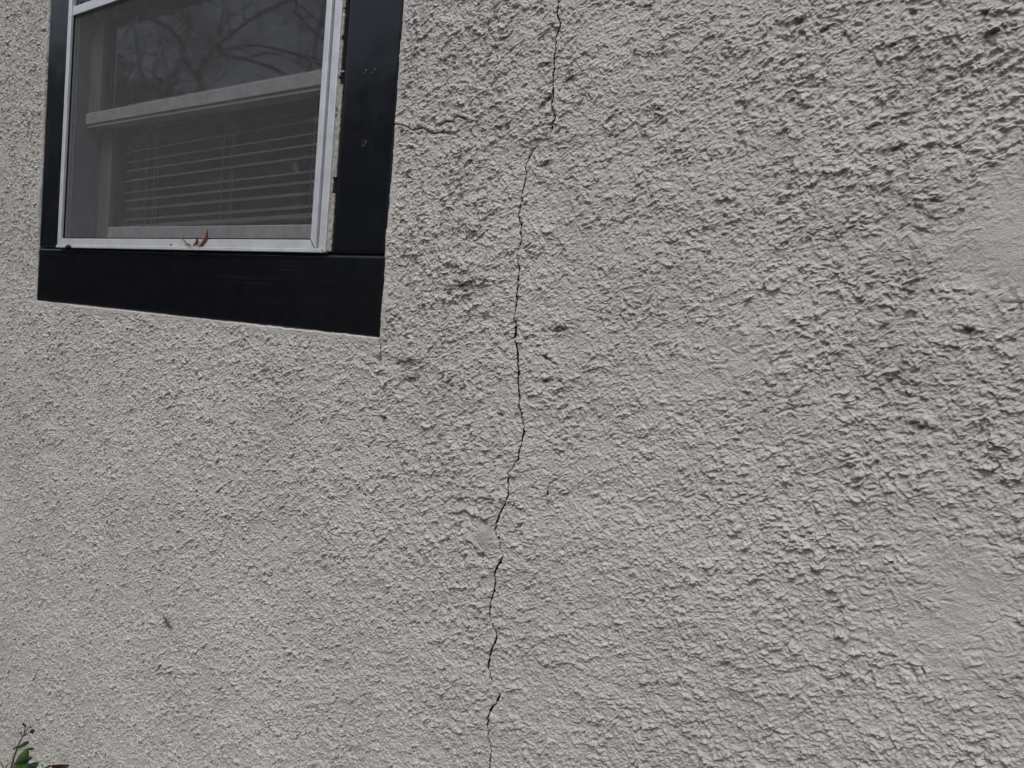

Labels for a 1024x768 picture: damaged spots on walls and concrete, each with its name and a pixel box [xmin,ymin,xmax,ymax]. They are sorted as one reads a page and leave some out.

crack [487,0,561,768]